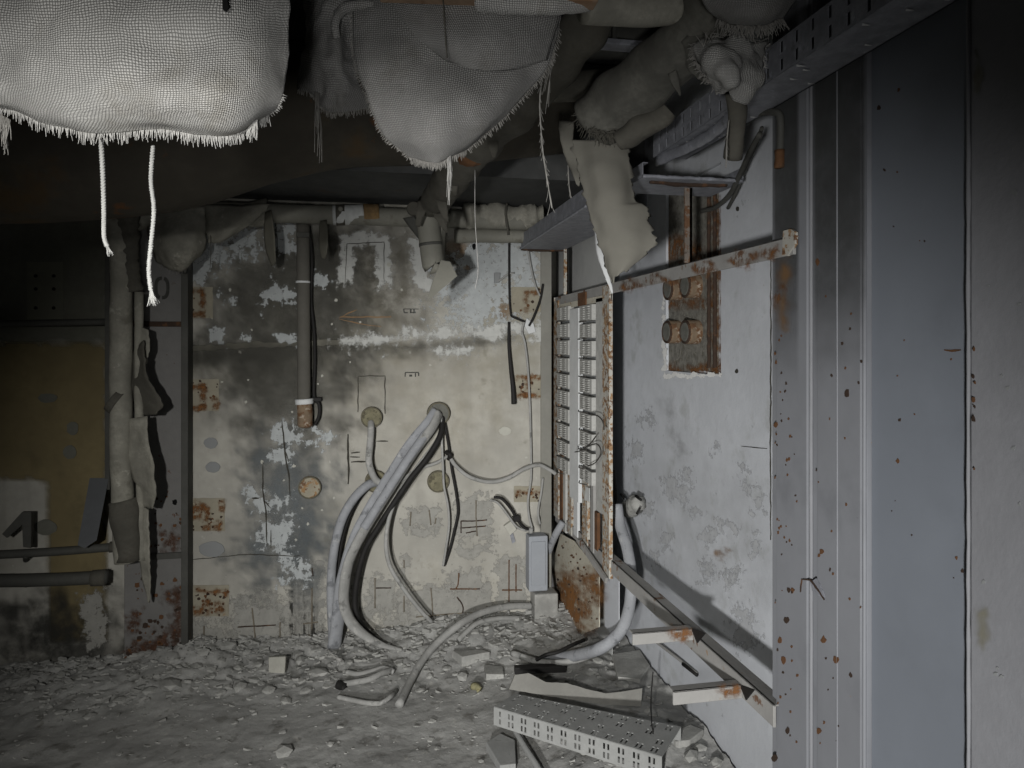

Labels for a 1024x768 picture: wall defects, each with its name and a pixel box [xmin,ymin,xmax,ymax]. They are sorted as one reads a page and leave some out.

peeling [193,223,297,306]
peeling [256,275,297,317]
peeling [313,268,333,290]
damp [310,230,541,408]
rust [649,181,778,374]
damp [193,242,334,567]
peeling [261,411,337,467]
rust [124,577,228,658]
rust [150,496,225,551]
spalling [193,481,327,640]
rust [552,533,603,634]
rust [775,579,825,603]